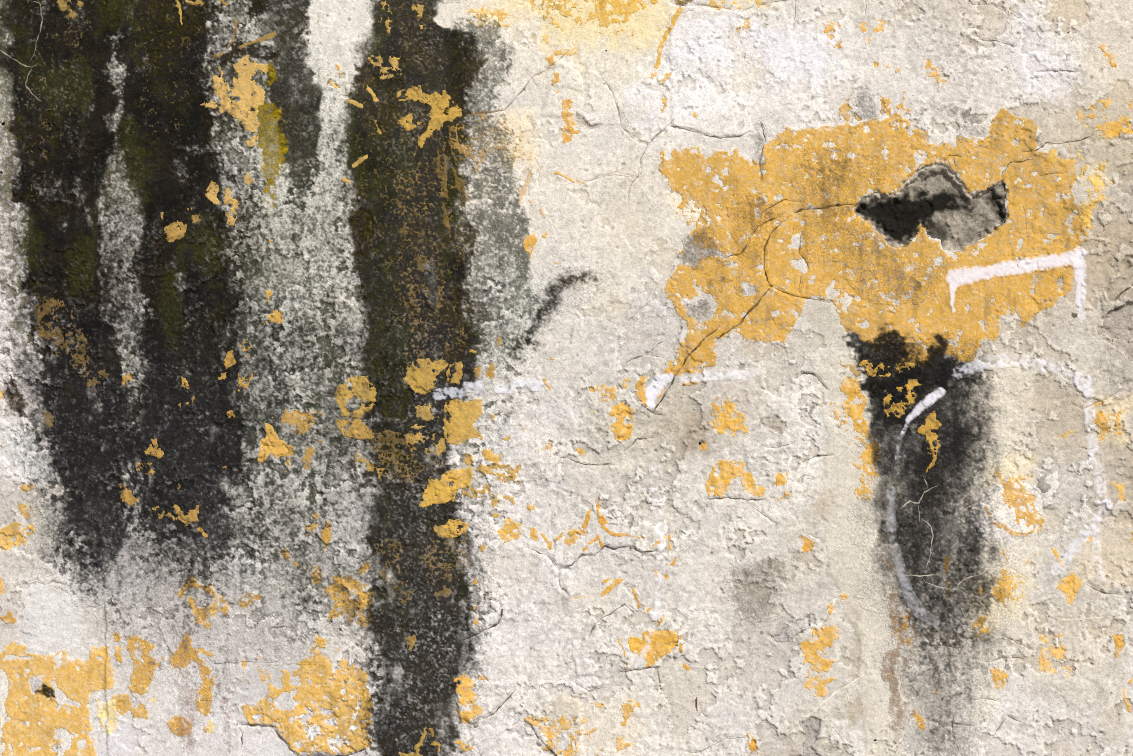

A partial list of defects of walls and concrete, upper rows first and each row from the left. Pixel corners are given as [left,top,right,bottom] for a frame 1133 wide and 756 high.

crack [463,51,568,117]
crack [589,74,766,198]
leakage [663,0,879,129]
leakage [676,145,950,323]
peeling [658,91,1115,386]
leakage [0,0,612,756]
crack [571,198,853,466]
peeling [152,504,208,538]
crack [705,496,771,520]
leakage [838,320,1029,756]
peeling [0,635,156,756]
peeling [239,645,368,756]